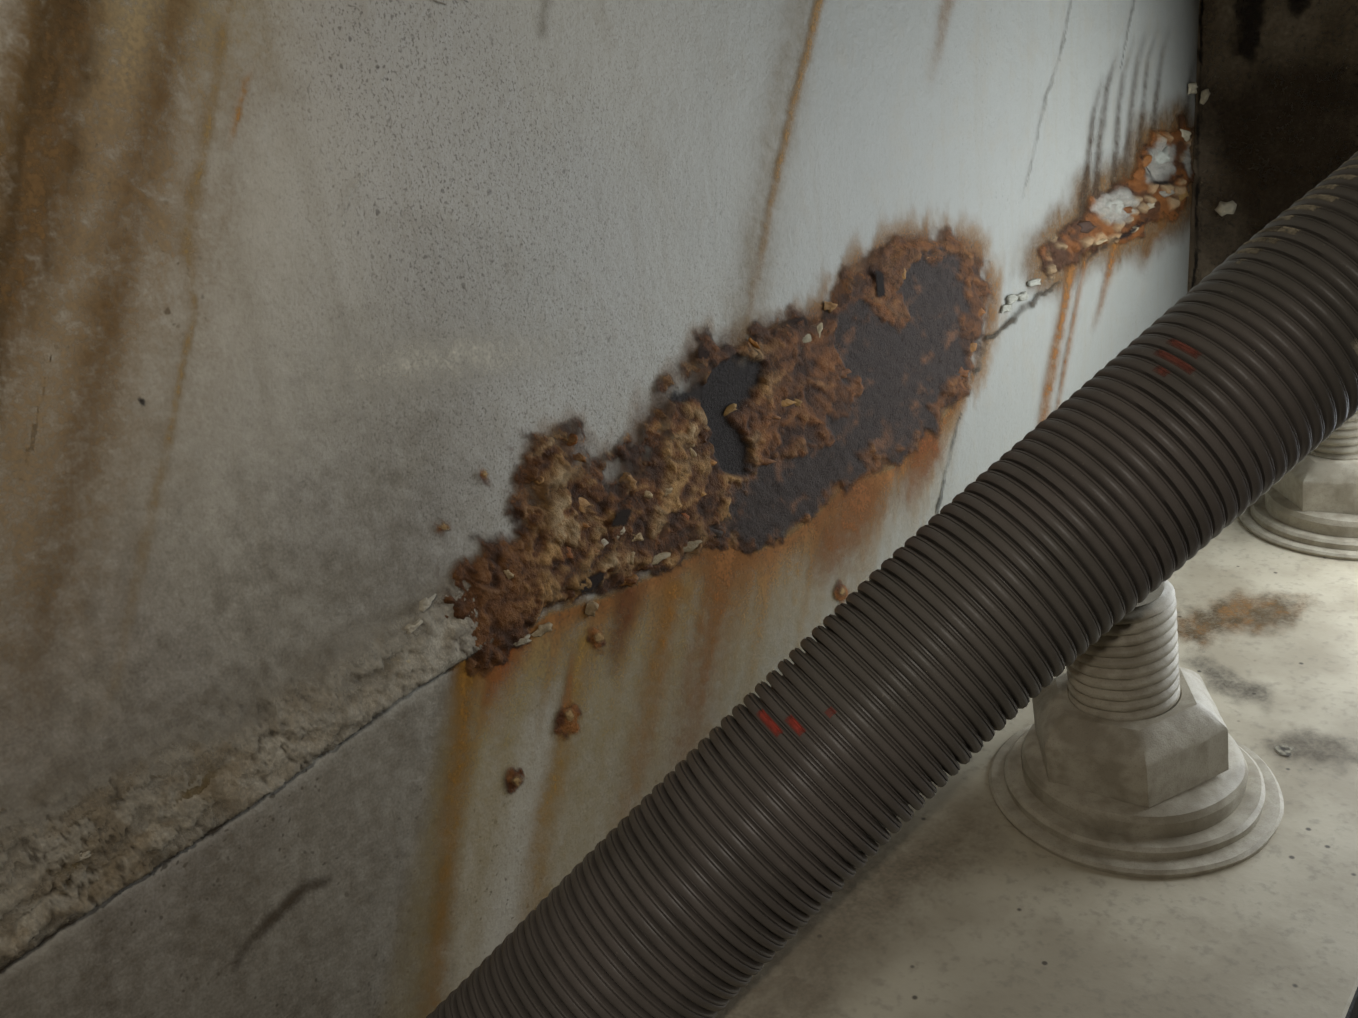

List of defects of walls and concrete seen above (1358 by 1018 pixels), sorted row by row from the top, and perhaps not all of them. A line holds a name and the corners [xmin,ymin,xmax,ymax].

corrosion [766,0,823,229]
leakage [1202,0,1358,245]
corrosion [1026,82,1198,422]
crack [143,709,387,862]
crack [0,913,86,974]